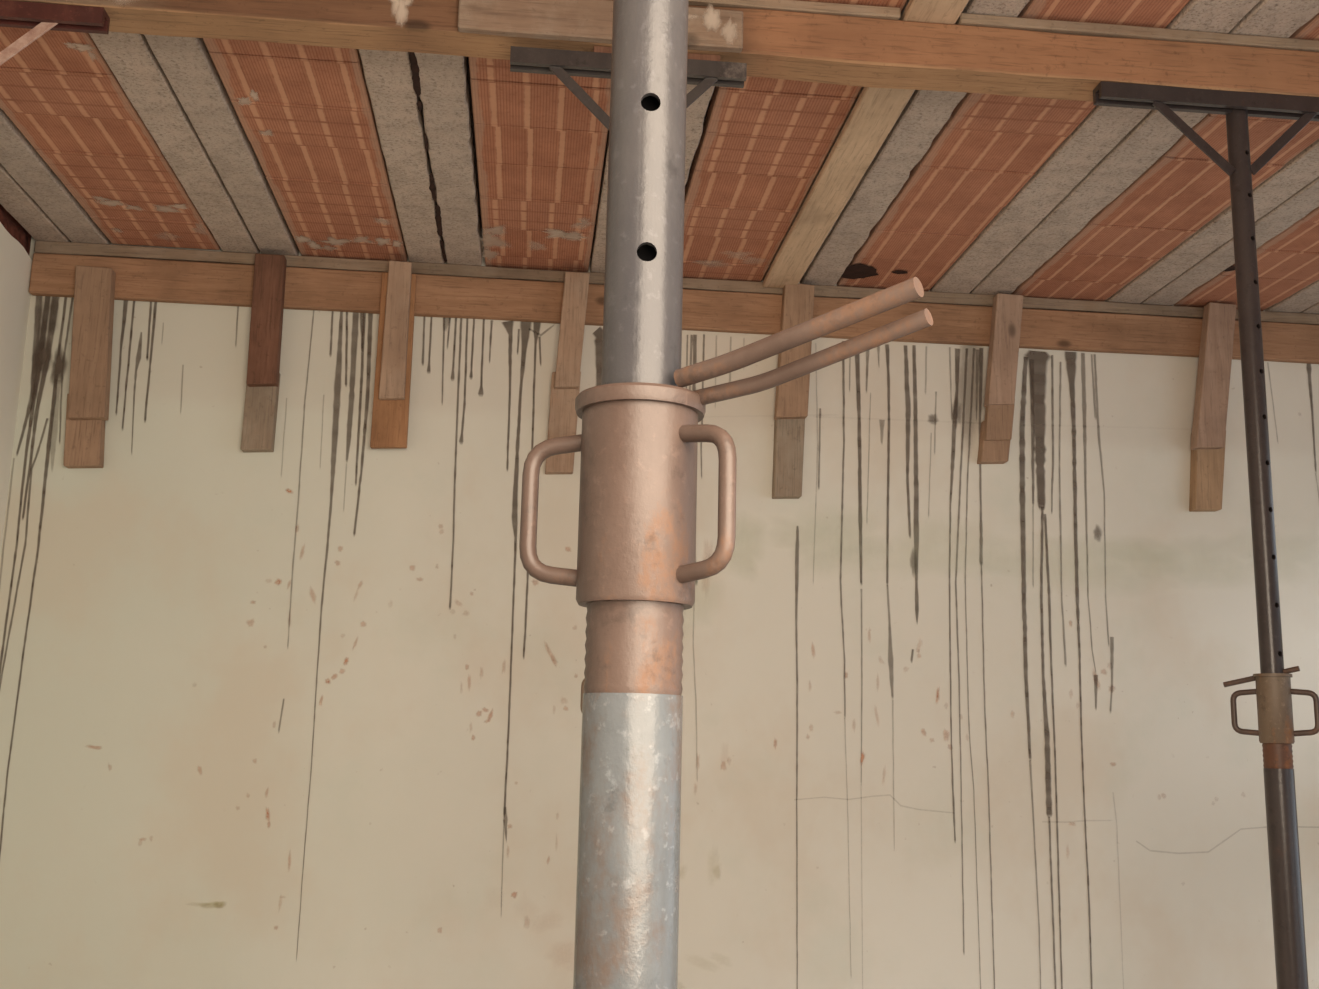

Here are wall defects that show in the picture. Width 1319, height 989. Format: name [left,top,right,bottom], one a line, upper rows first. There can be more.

water stain [0,296,73,854]
water stain [116,300,157,452]
water stain [296,311,373,958]
water stain [422,317,541,839]
water stain [593,327,603,386]
water stain [691,334,705,364]
water stain [840,354,868,716]
water stain [885,344,919,622]
water stain [949,348,995,989]
water stain [1019,350,1112,989]